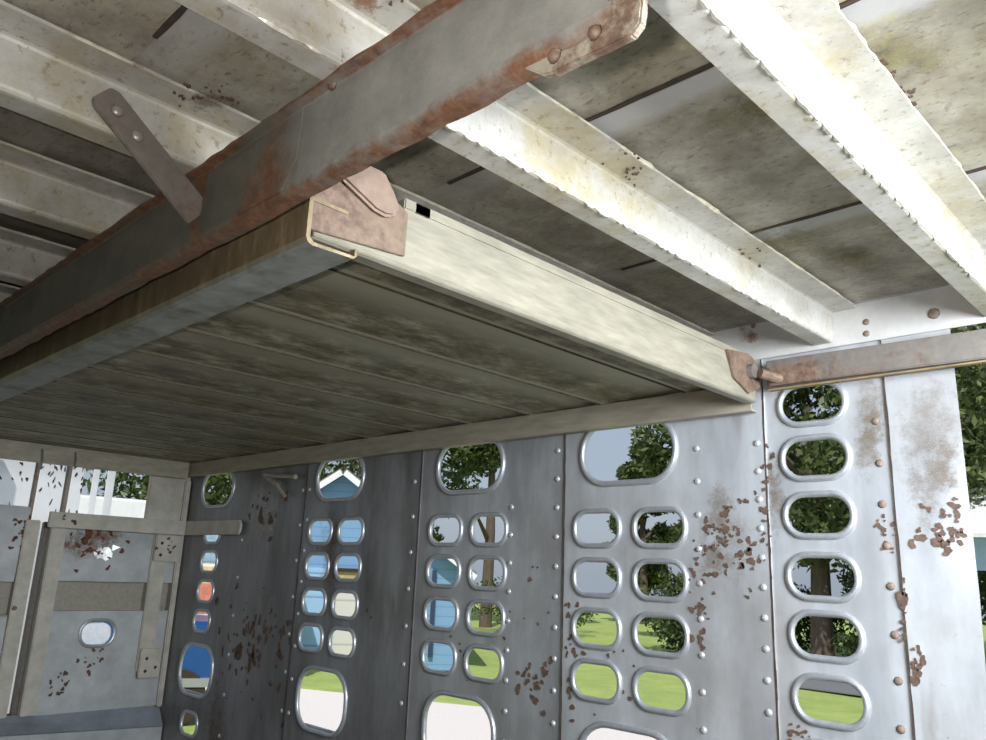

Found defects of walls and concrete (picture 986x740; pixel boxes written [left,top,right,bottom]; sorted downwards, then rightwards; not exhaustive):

corrosion [62,514,130,570]